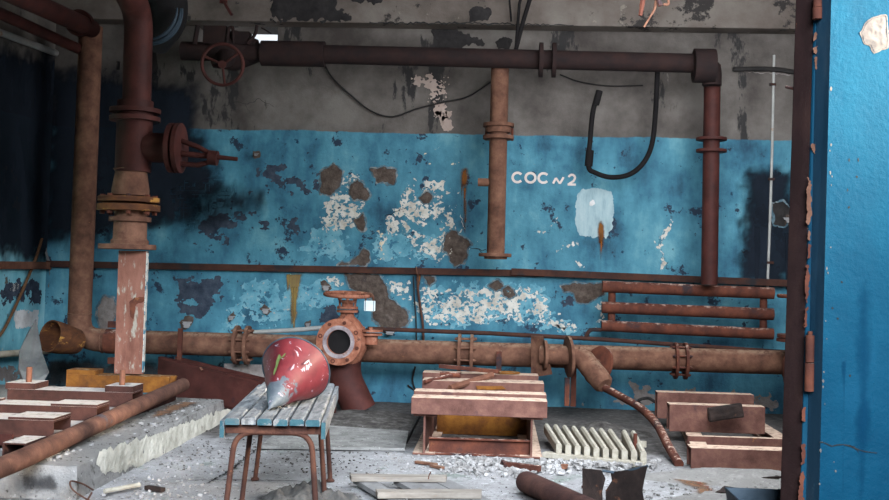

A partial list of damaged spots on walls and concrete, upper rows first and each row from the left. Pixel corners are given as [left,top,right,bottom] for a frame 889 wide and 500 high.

flaking render [860,14,889,54]
peeling [173,151,606,335]
peeling [0,248,51,329]
peeling [0,364,23,382]